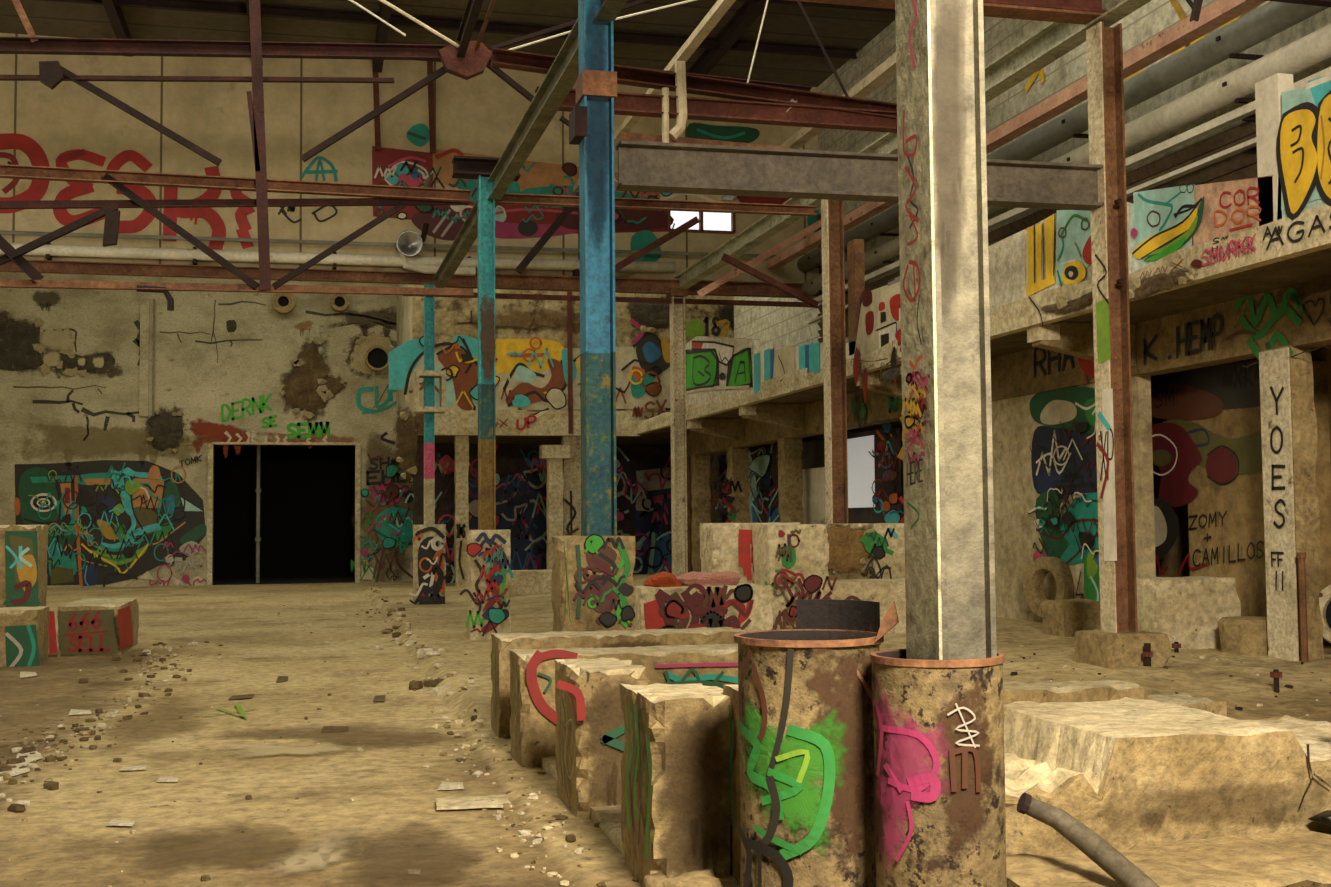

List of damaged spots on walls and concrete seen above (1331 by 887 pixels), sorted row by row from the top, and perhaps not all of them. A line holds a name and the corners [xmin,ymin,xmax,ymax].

corrosion [585,0,606,71]
corrosion [586,96,610,235]
crack [43,328,77,352]
peeling [0,311,122,379]
spalling [279,332,397,421]
crack [13,385,139,441]
spalling [145,407,188,456]
corrosion [937,681,994,854]